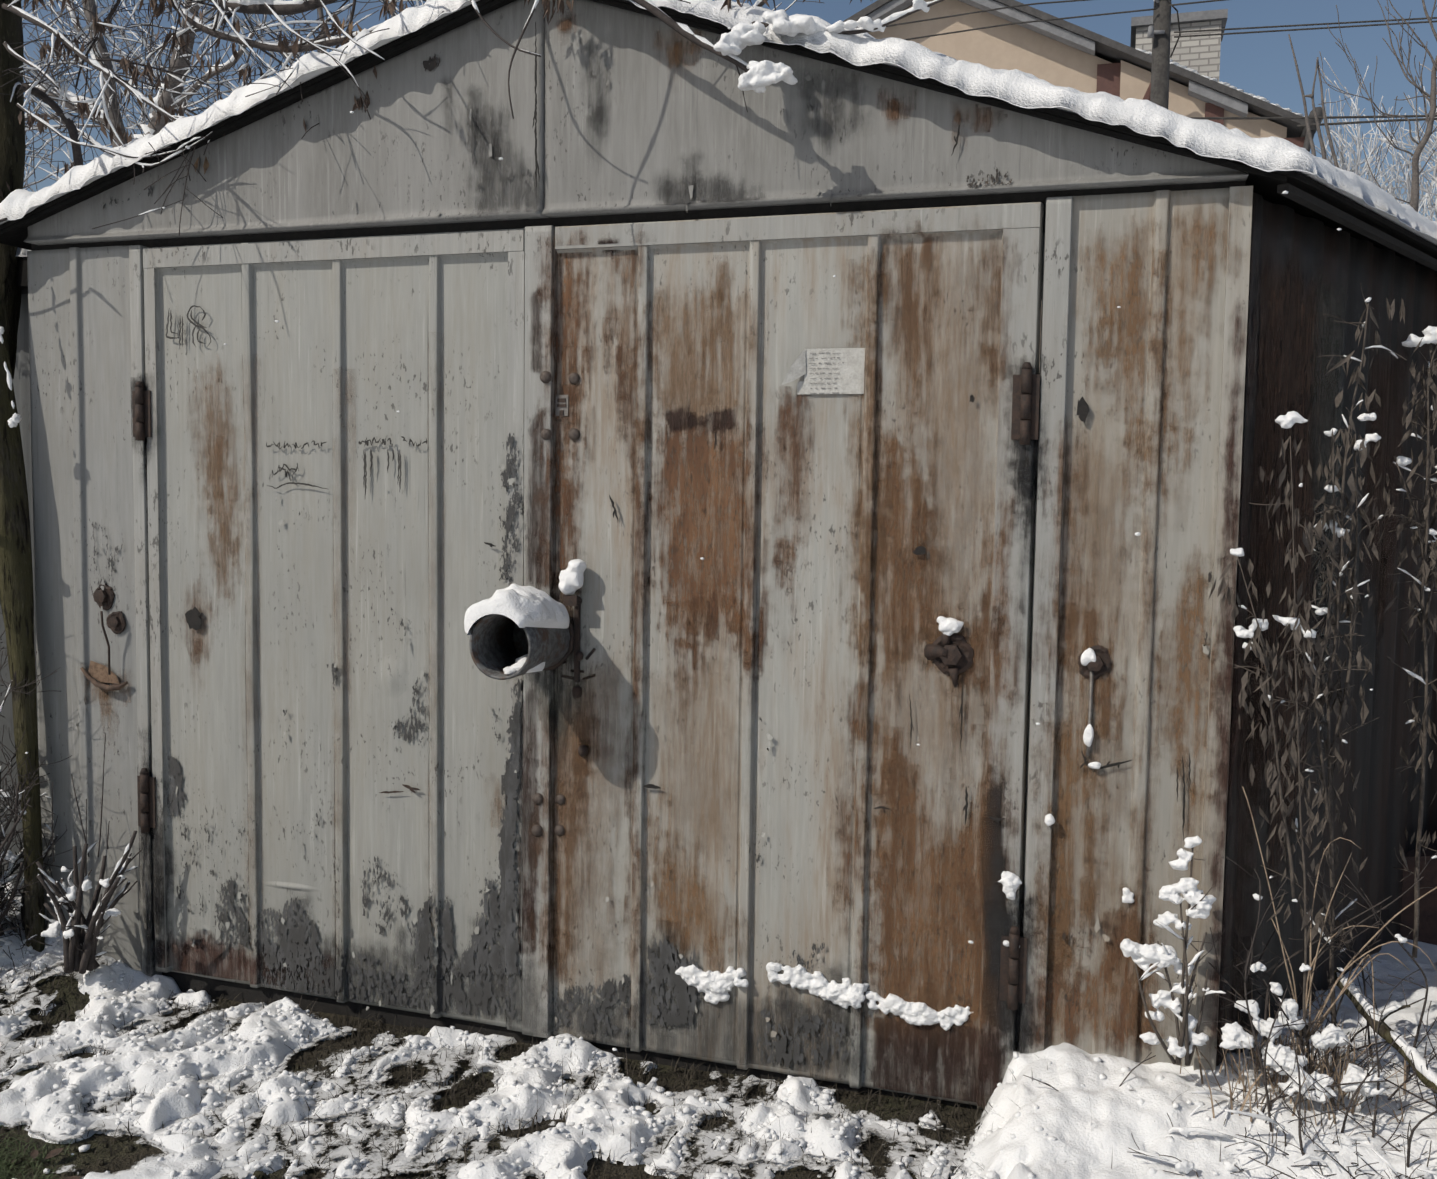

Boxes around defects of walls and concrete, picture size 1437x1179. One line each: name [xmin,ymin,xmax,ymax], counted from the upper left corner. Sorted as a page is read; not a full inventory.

water stain [659,180,757,205]
rust [1087,229,1207,458]
rust [206,373,237,579]
rust [528,235,811,786]
rust [850,237,1016,689]
rust [1057,447,1083,543]
rust [155,933,336,991]
rust [517,693,598,964]
rust [625,804,738,958]
water stain [569,936,853,1071]
rust [835,683,1014,1107]
rust [1031,560,1163,1052]